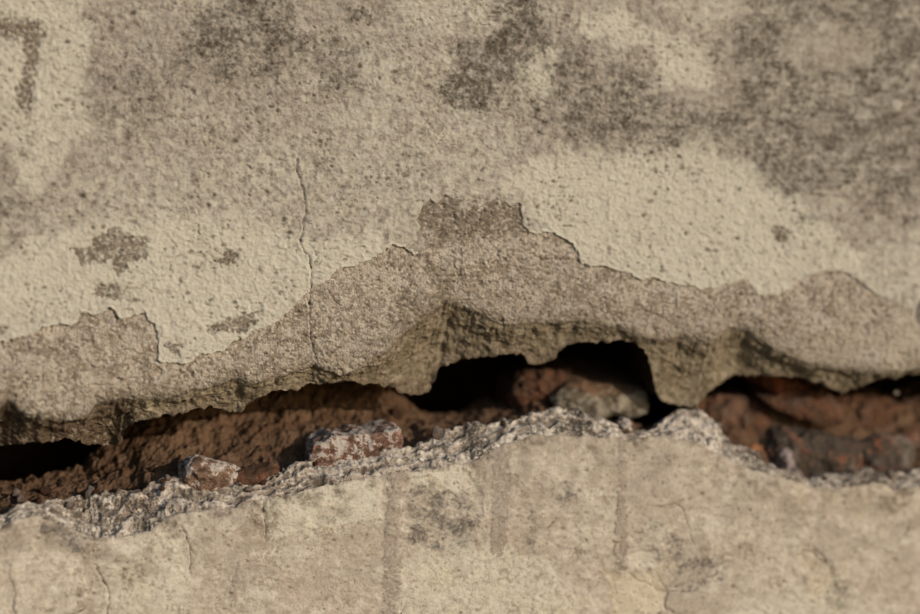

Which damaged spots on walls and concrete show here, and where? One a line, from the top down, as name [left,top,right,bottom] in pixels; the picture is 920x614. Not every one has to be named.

damp [180,0,308,83]
damp [439,0,554,113]
damp [552,44,602,138]
damp [596,0,920,215]
spalling [0,196,920,422]
crack [0,160,920,570]
flaking render [765,424,920,479]